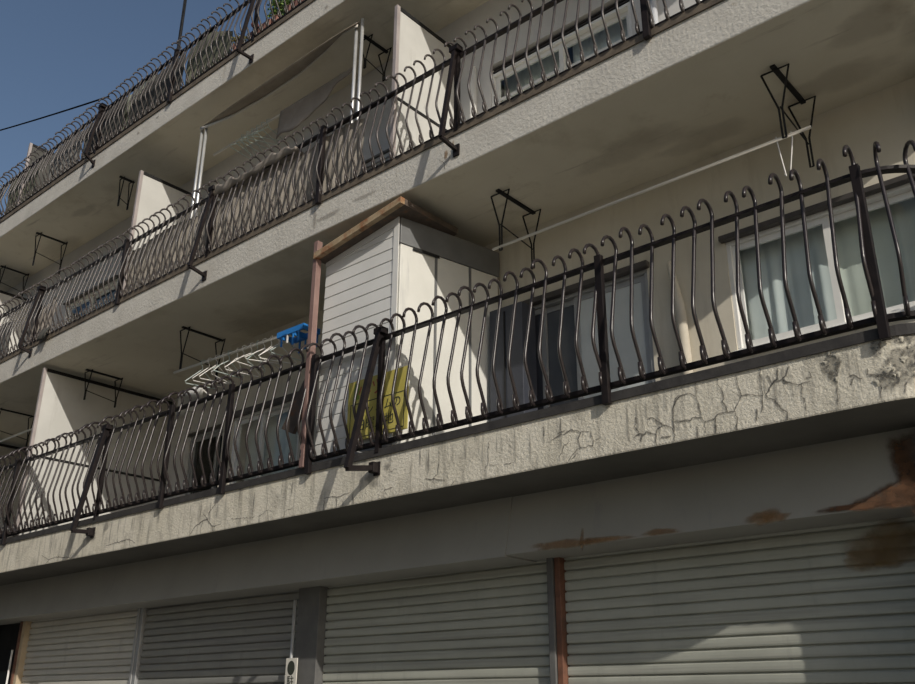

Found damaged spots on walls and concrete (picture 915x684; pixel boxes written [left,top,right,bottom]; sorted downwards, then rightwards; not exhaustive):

spalling [871,335,915,388]
crack [634,366,811,445]
crack [836,368,907,410]
crack [543,419,599,460]
corrosion [819,435,915,512]